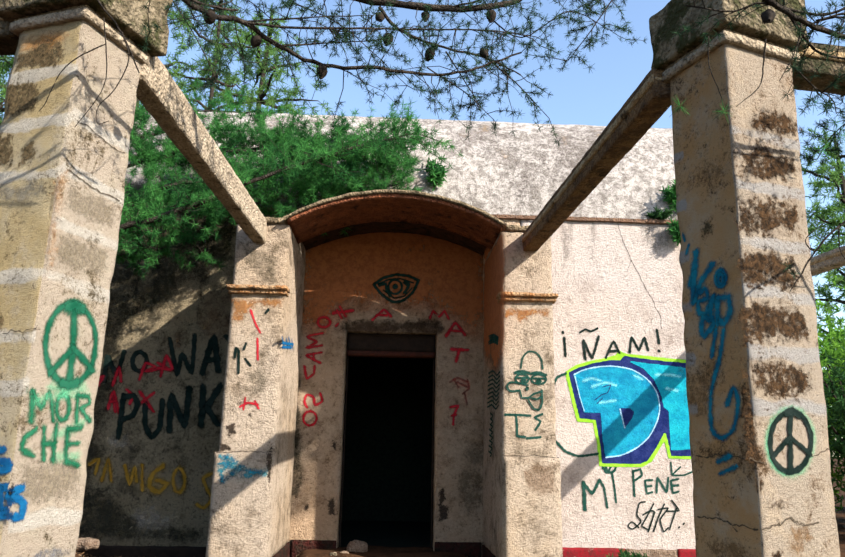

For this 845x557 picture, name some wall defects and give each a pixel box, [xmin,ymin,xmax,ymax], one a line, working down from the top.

damp [124,177,178,202]
crack [616,217,668,329]
damp [79,212,234,542]
crack [697,516,819,532]